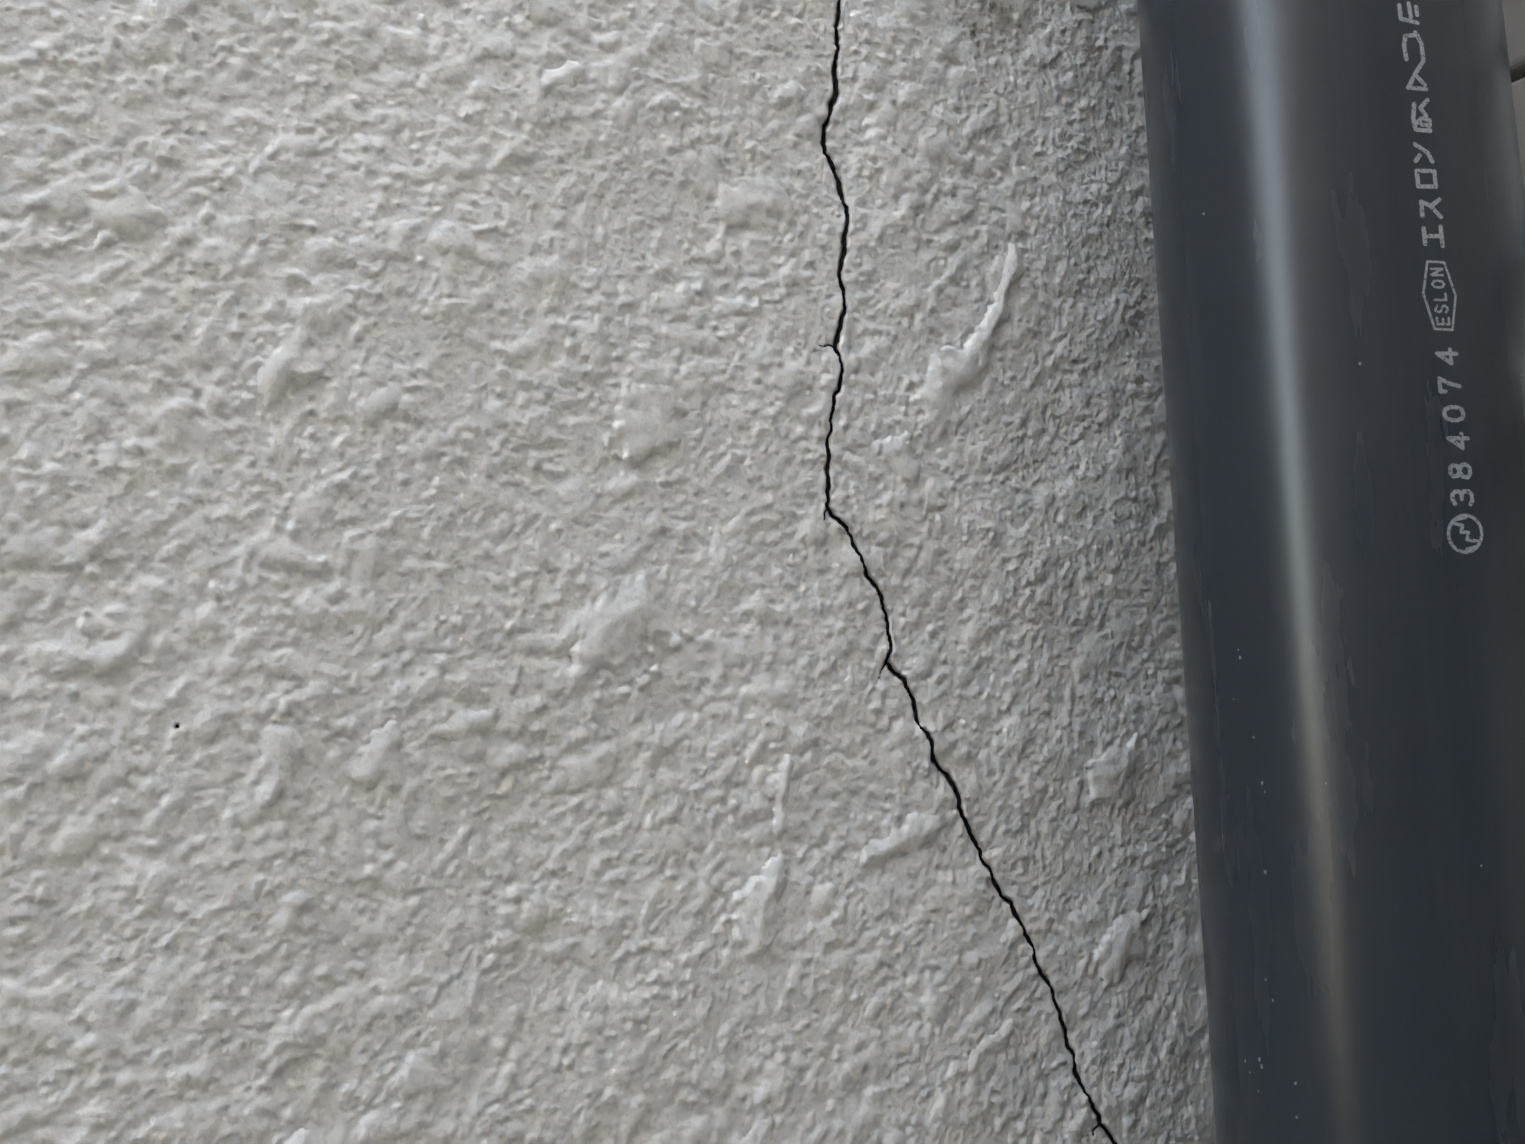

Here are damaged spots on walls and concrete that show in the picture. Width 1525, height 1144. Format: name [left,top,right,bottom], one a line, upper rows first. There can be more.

crack [819,0,1117,1144]